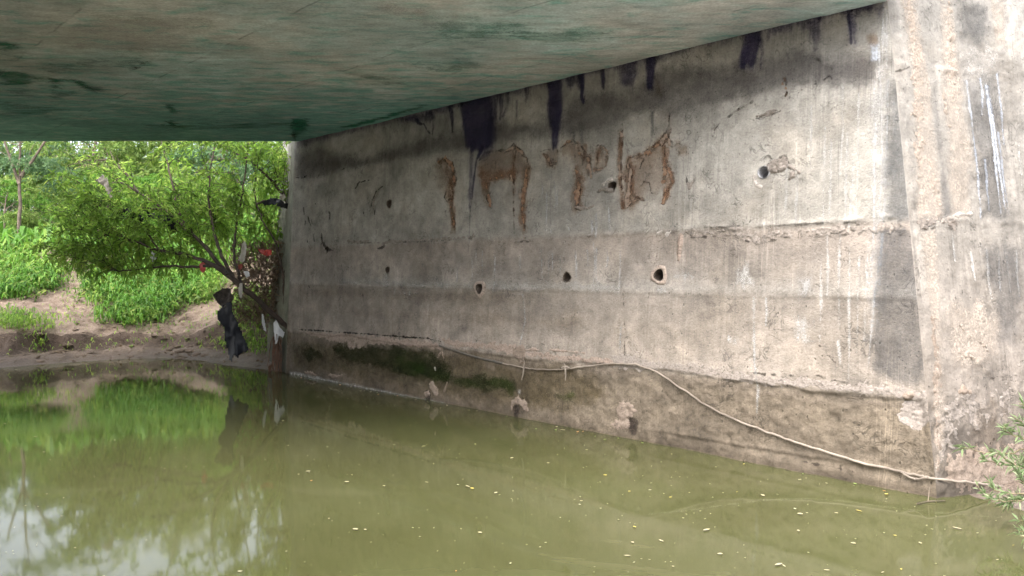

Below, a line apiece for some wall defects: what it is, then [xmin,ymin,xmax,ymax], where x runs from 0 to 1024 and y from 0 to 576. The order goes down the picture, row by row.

spalling [437,155,457,233]
leakage [448,96,494,196]
spalling [477,143,533,243]
leakage [547,79,563,150]
spalling [543,115,675,211]
leakage [646,56,656,90]
leakage [740,30,762,70]
leakage [903,0,1005,218]